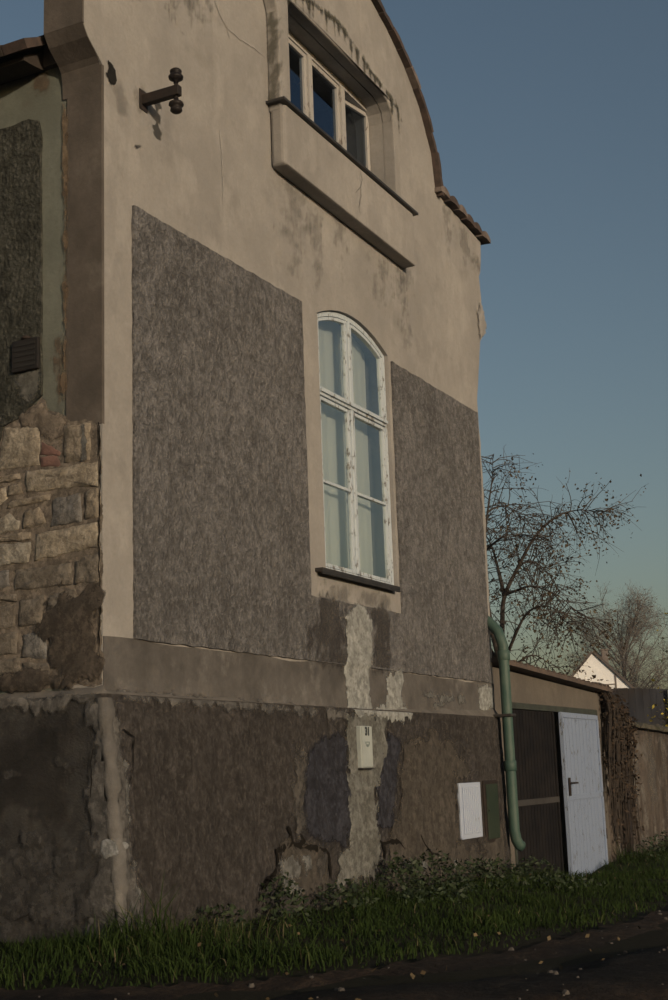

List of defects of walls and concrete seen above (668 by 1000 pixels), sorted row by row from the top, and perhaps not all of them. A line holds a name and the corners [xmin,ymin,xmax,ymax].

damp [306,0,399,121]
flaking render [0,369,352,947]